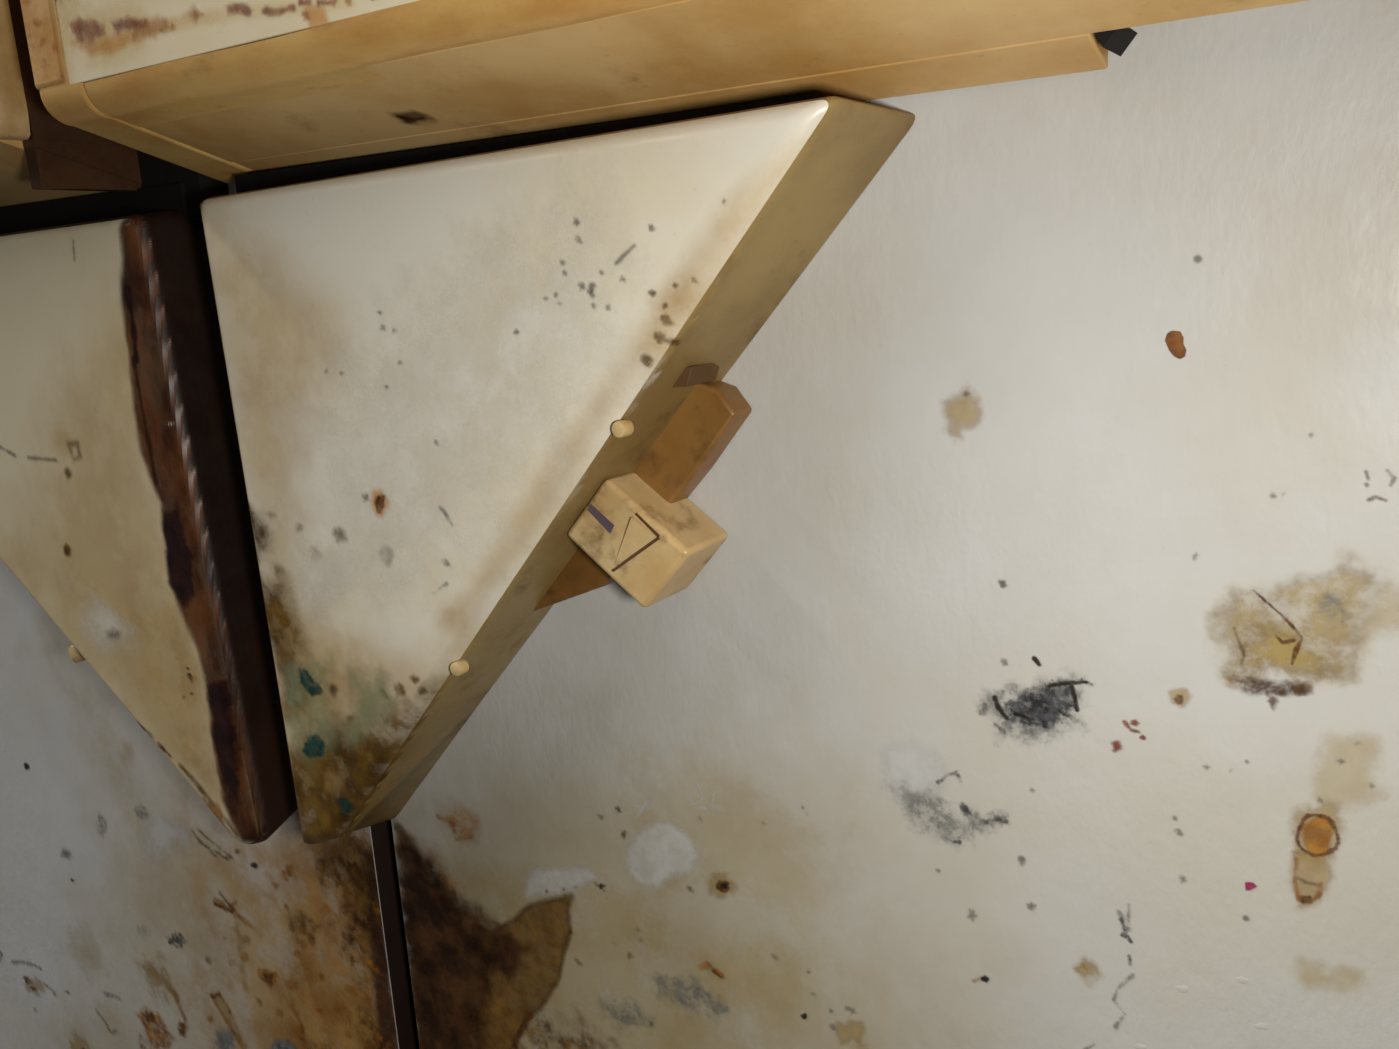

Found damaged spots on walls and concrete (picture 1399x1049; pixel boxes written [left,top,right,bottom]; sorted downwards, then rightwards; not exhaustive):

damp [1232,575,1360,669]
damp [1232,679,1310,706]
corrosion [1296,814,1340,856]